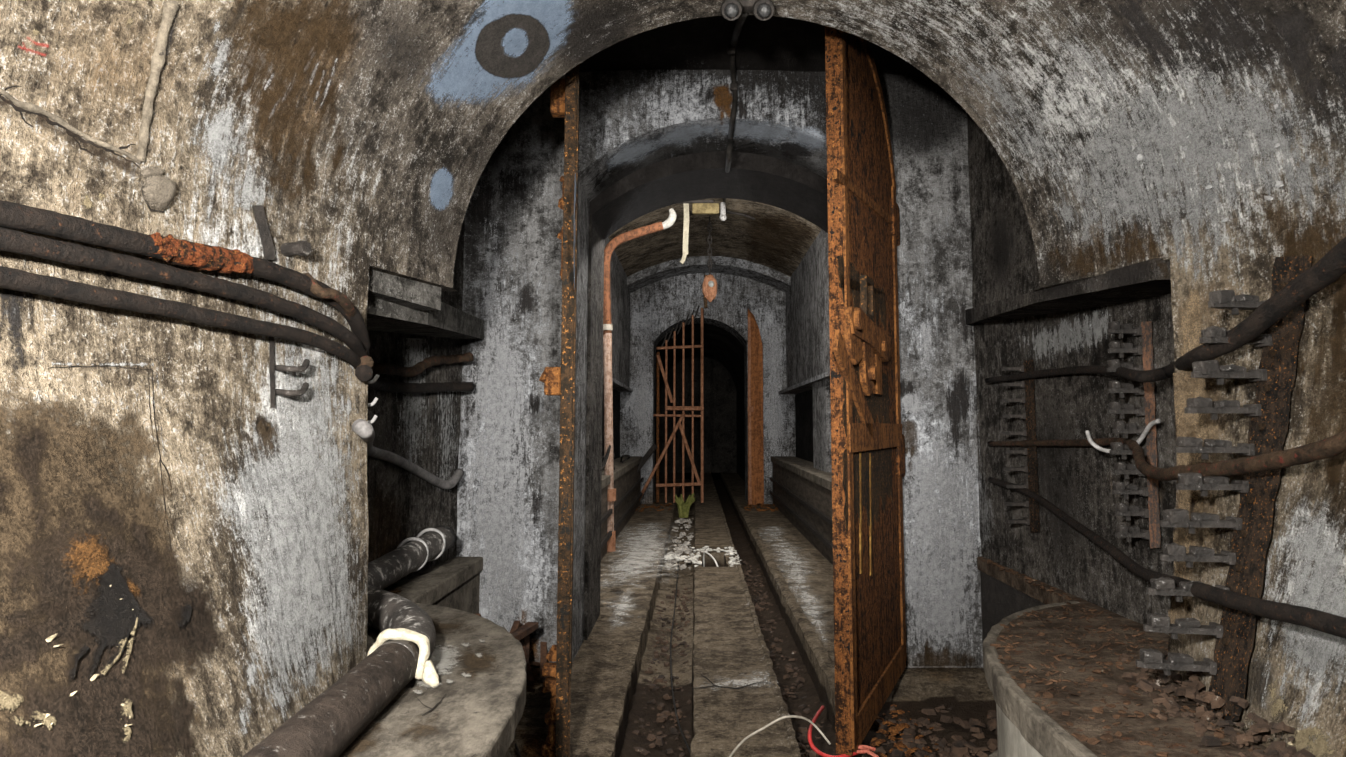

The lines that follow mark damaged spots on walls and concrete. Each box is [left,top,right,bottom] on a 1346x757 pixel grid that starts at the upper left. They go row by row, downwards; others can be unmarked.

efflorescence [196,21,232,90]
efflorescence [192,104,274,224]
water stain [0,289,369,757]
corrosion [67,534,115,587]
water stain [432,619,499,678]
water stain [342,723,382,757]